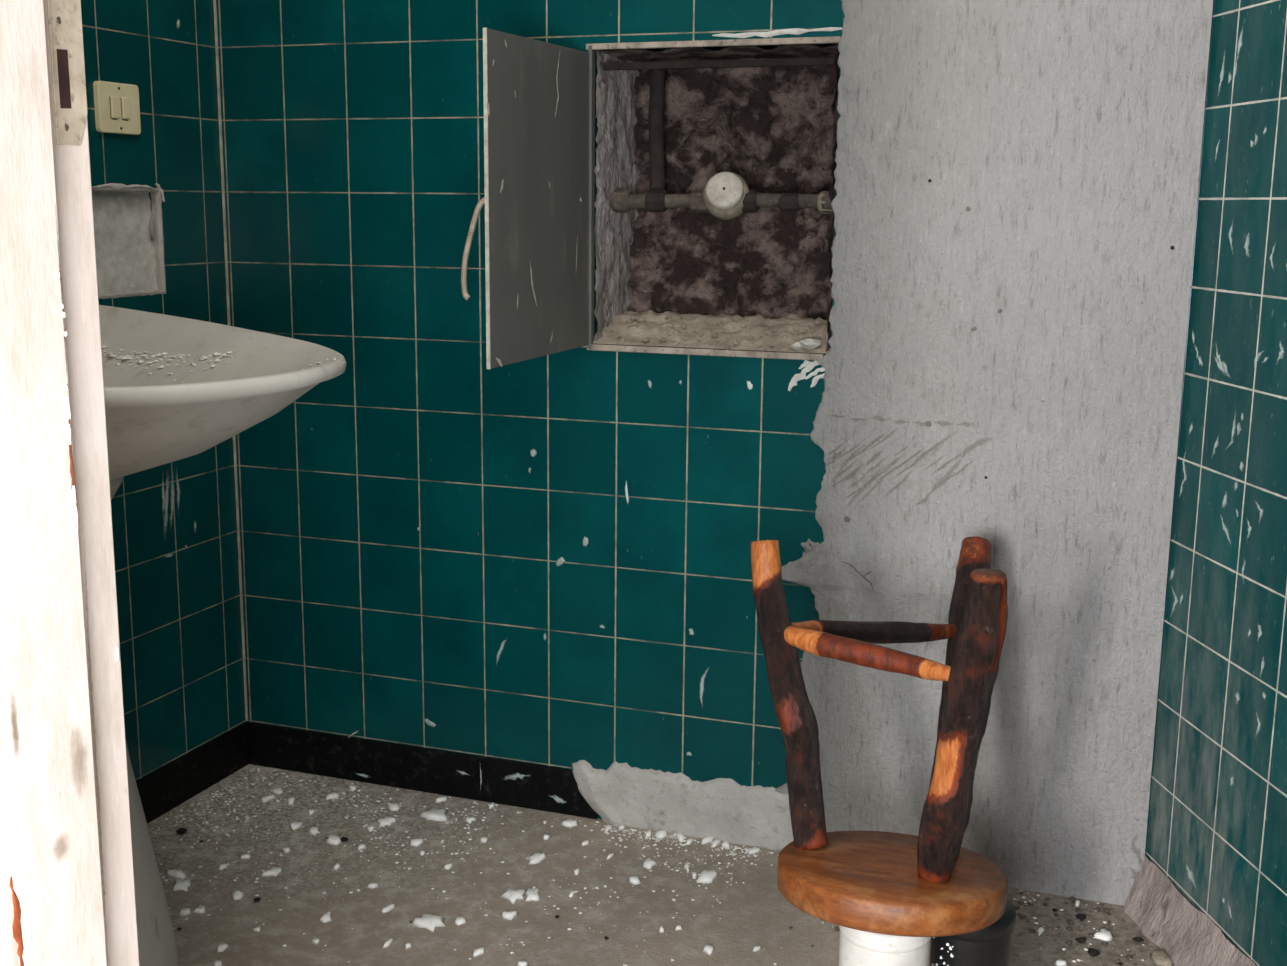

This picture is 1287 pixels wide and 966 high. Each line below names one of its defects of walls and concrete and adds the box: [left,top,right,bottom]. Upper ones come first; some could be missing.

spalling [830,415,984,523]